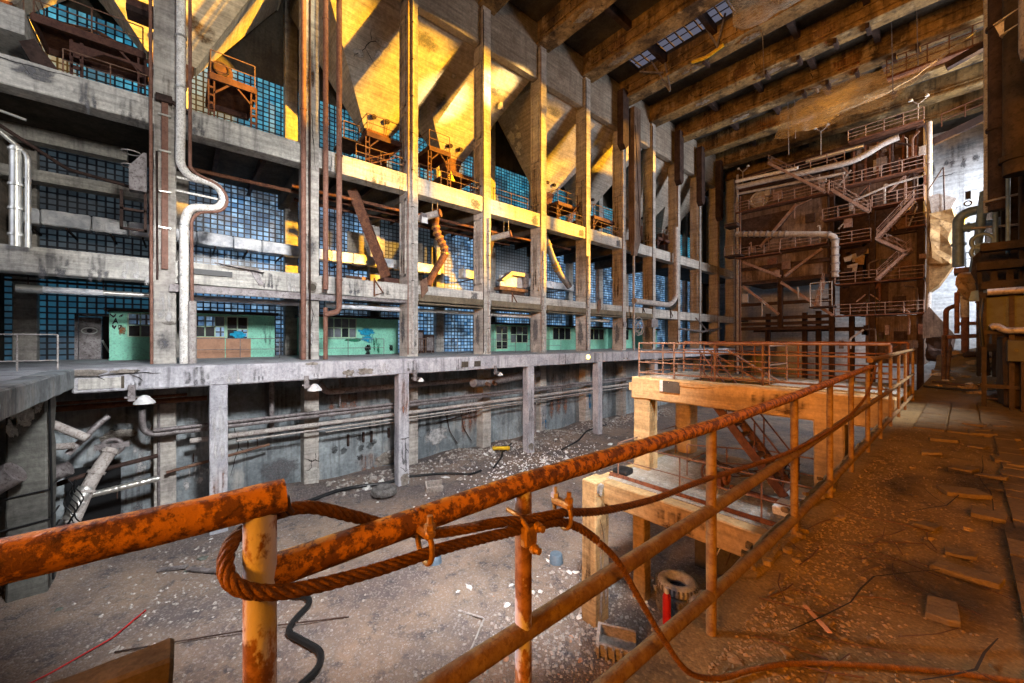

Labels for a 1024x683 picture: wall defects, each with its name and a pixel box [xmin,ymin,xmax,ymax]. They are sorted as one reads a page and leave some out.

spalling [0,389,154,527]
spalling [176,386,209,502]
spalling [227,368,395,491]
leakage [332,418,407,471]
spalling [418,370,477,459]
spalling [491,367,534,451]
spalling [546,355,728,430]
spalling [741,355,751,375]